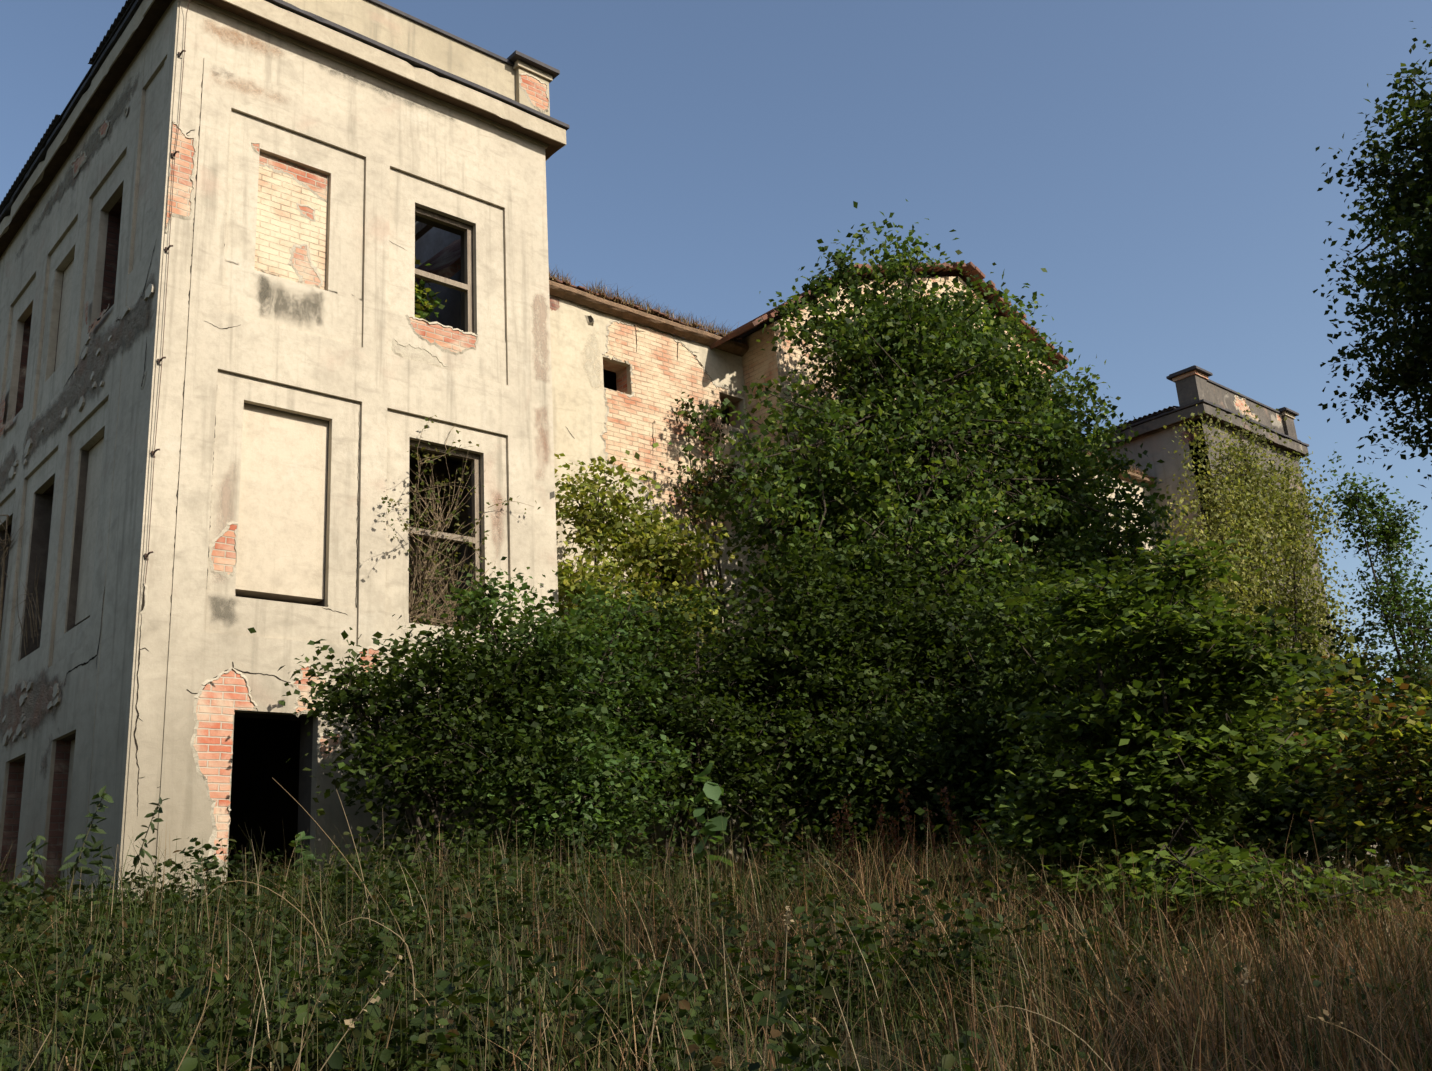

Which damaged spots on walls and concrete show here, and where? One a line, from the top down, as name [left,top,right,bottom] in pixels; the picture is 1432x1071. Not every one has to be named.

flaking render [519,73,549,113]
flaking render [165,121,197,233]
flaking render [251,142,328,222]
flaking render [0,275,155,491]
crack [65,242,156,385]
flaking render [391,315,479,369]
crack [133,79,240,816]
flaking render [208,479,238,579]
flaking render [600,320,739,656]
crack [64,588,105,685]
flaking render [0,672,63,746]
flaking render [190,667,258,865]